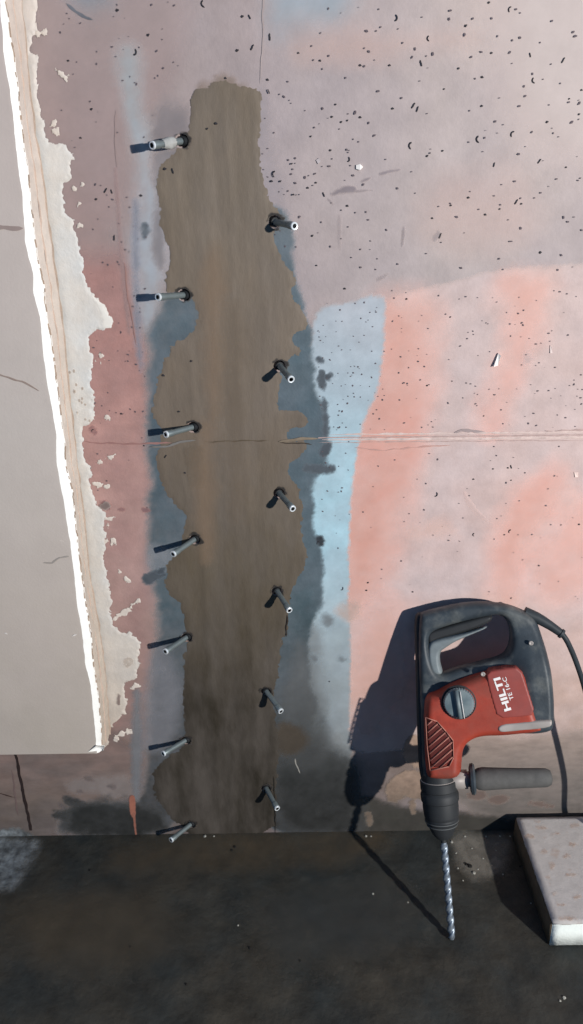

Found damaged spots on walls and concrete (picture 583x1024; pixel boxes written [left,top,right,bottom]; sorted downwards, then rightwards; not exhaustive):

peeling [92,296,113,328]
crack [85,429,583,451]
spalling [92,482,124,546]
peeling [113,598,141,621]
rust [129,795,137,835]